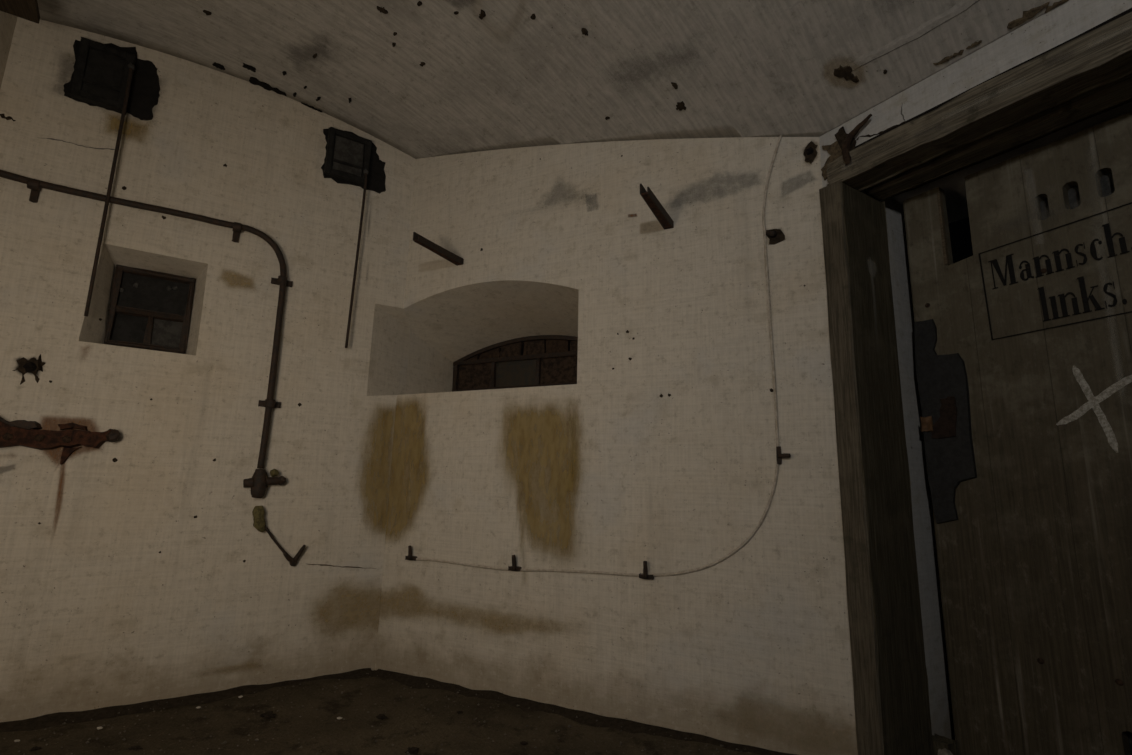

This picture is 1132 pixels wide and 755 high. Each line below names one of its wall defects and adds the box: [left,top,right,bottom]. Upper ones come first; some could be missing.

corrosion [41,418,96,432]
corrosion [44,445,98,521]
damp [364,402,427,537]
damp [505,408,578,553]